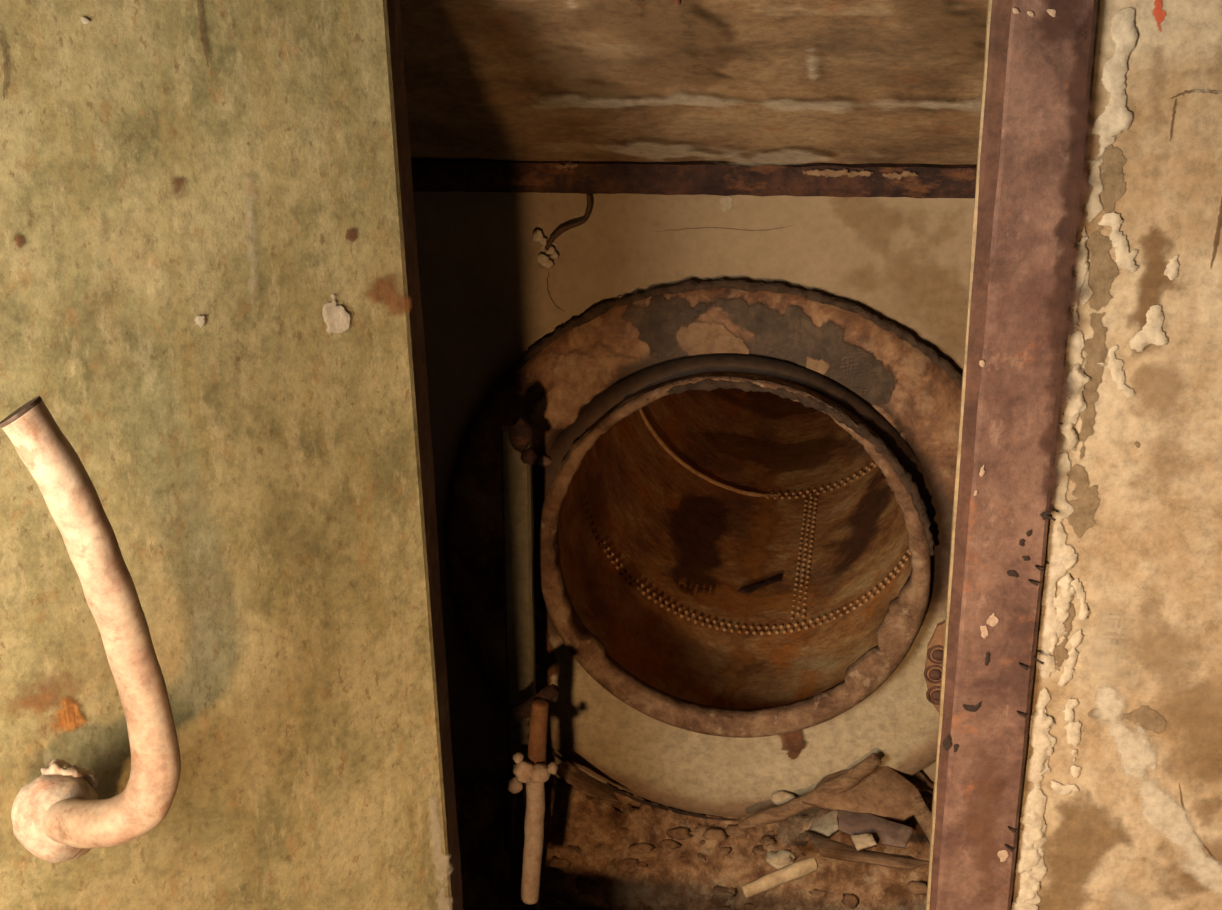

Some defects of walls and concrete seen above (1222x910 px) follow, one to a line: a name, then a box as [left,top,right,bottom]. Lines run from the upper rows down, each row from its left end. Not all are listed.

corrosion [803,170,917,180]
peeling [322,294,350,334]
corrosion [1039,0,1094,513]
peeling [1058,7,1168,538]
peeling [1164,255,1179,280]
corrosion [712,388,817,419]
corrosion [535,617,559,693]
peeling [1029,554,1166,795]
corrosion [778,730,805,760]
leakage [1095,687,1222,898]
peeling [998,810,1044,910]
leakage [1036,805,1129,910]